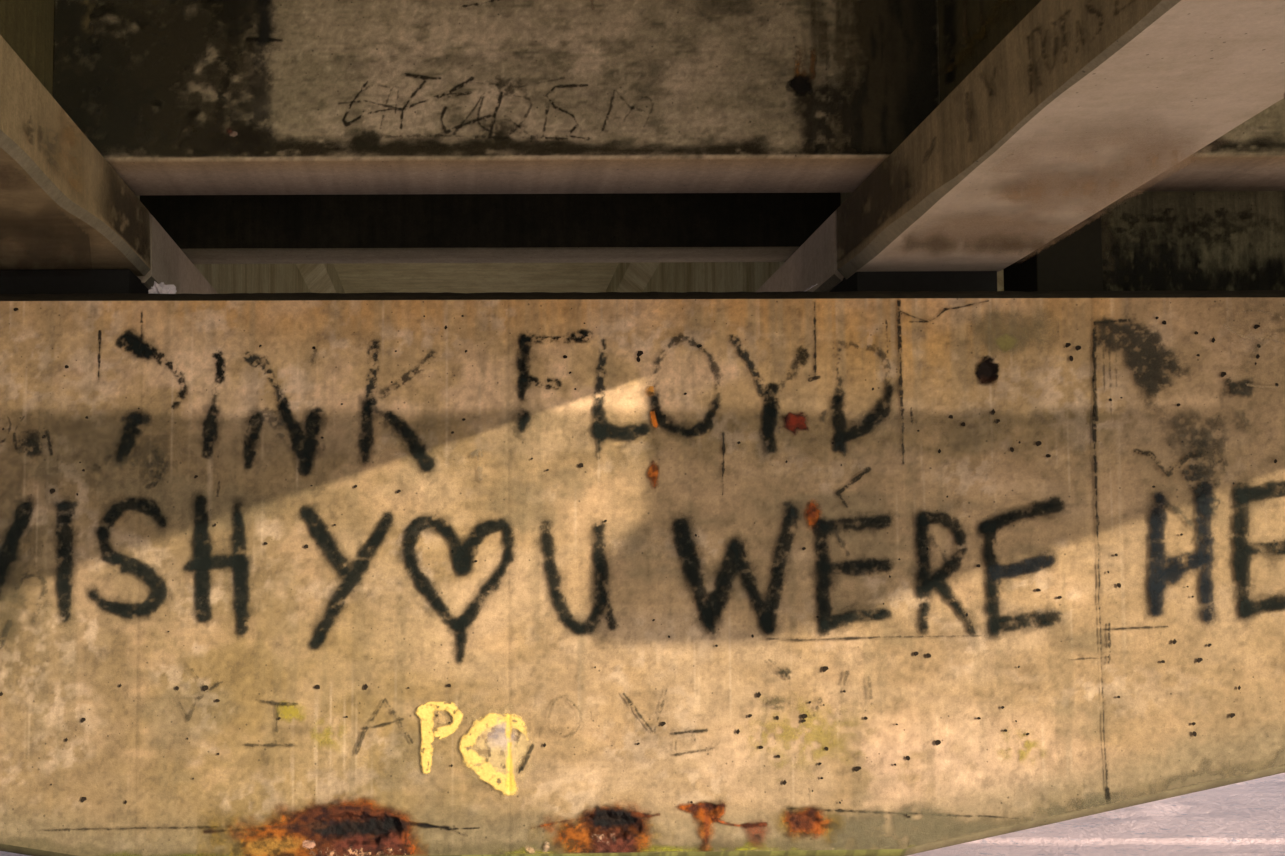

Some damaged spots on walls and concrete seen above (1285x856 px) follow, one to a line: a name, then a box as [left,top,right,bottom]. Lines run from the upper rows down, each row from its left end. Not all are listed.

water stain [26,0,282,260]
rust [203,799,450,856]
rust [526,805,660,853]
rust [678,802,838,851]